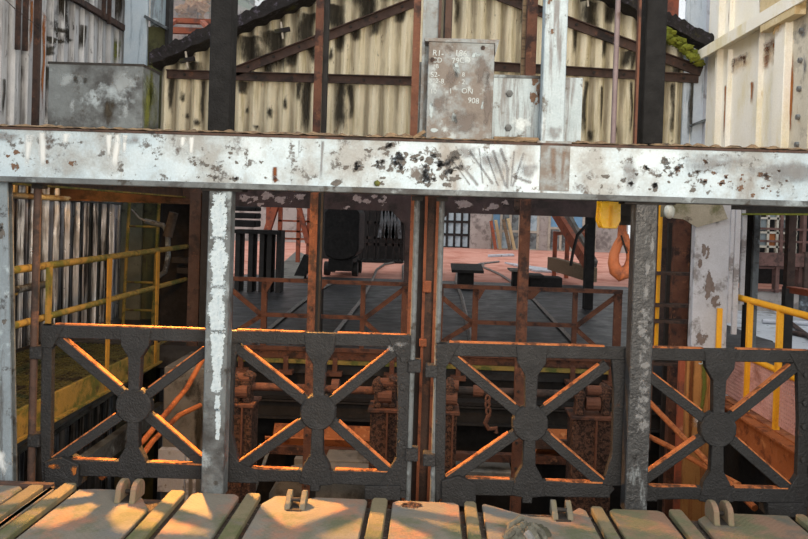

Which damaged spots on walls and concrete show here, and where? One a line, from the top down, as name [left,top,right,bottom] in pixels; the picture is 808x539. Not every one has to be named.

leakage [330,4,344,27]
leakage [355,0,376,17]
leakage [606,7,615,22]
leakage [240,30,286,61]
leakage [335,29,360,50]
leakage [296,82,311,127]
leakage [335,83,354,128]
peeling [337,142,466,188]
peeling [620,157,771,198]
peeling [345,194,387,209]
peeling [698,244,721,308]
peeling [207,193,229,440]